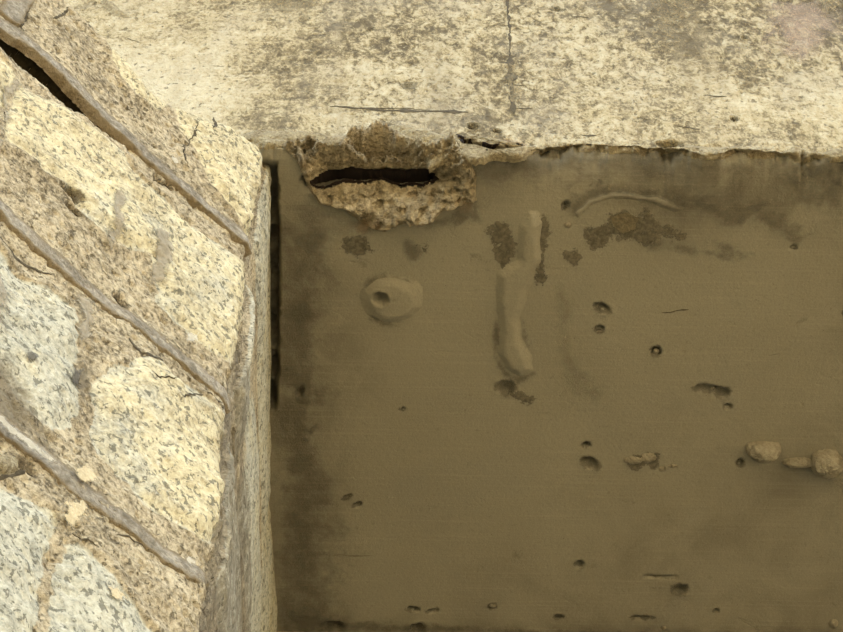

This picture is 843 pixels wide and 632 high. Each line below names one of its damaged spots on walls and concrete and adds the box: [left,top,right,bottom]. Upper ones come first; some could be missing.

crack [505,0,518,114]
spalling [241,120,540,259]